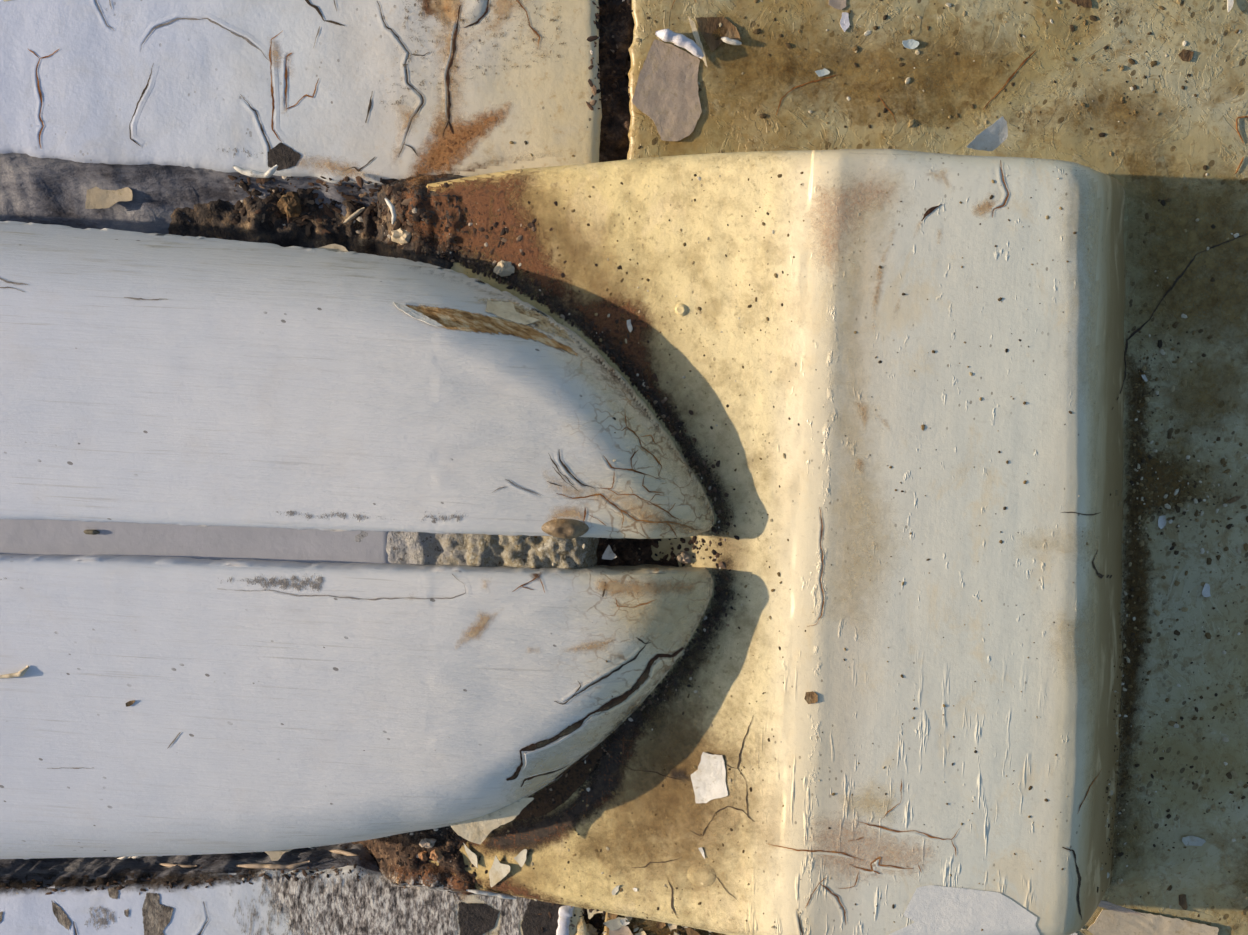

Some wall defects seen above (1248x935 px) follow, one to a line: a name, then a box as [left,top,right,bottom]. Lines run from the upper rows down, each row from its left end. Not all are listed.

crack [90,0,344,167]
spalling [268,142,301,171]
peeling [319,244,349,252]
crack [344,0,540,172]
rust [400,0,685,445]
crack [495,414,698,537]
crack [506,582,692,787]
peeling [52,886,174,935]
peeling [235,745,603,935]
crack [632,715,957,935]
peeling [888,885,1040,935]
peeling [1070,900,1219,935]